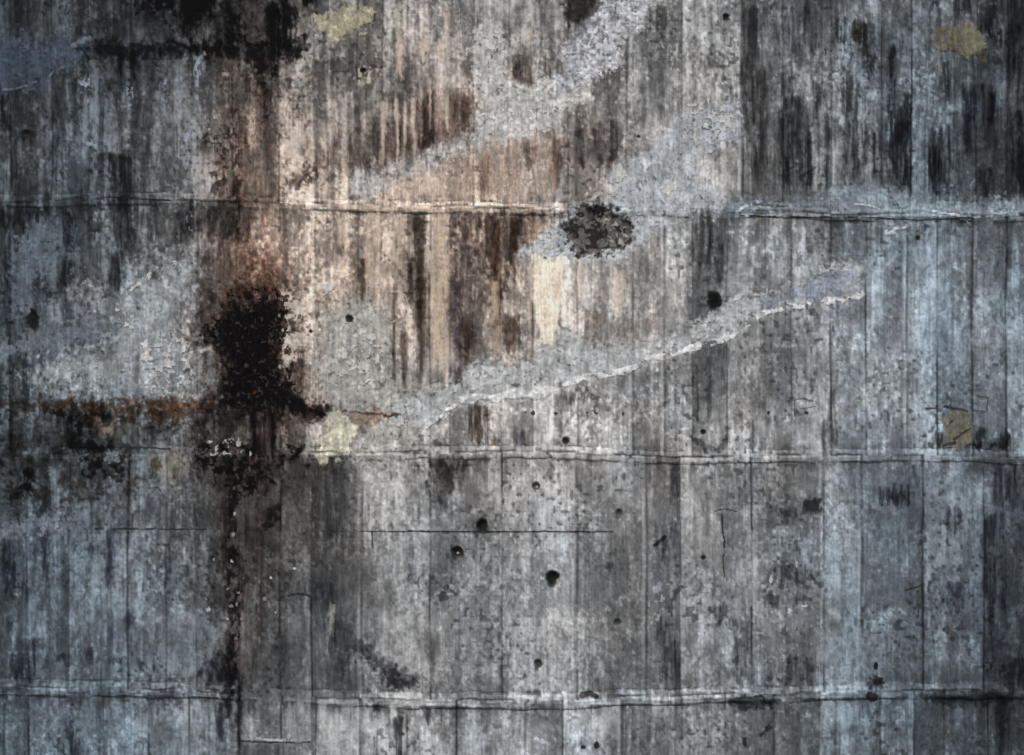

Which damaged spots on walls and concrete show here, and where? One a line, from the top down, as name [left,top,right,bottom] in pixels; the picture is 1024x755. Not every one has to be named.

damp [393,0,451,83]
damp [626,3,667,58]
damp [311,77,679,391]
spalling [520,93,1024,270]
damp [690,0,1024,311]
corrosion [0,388,217,431]
damp [0,0,352,755]
corrosion [275,390,402,435]
damp [689,342,731,454]
damp [316,577,430,755]